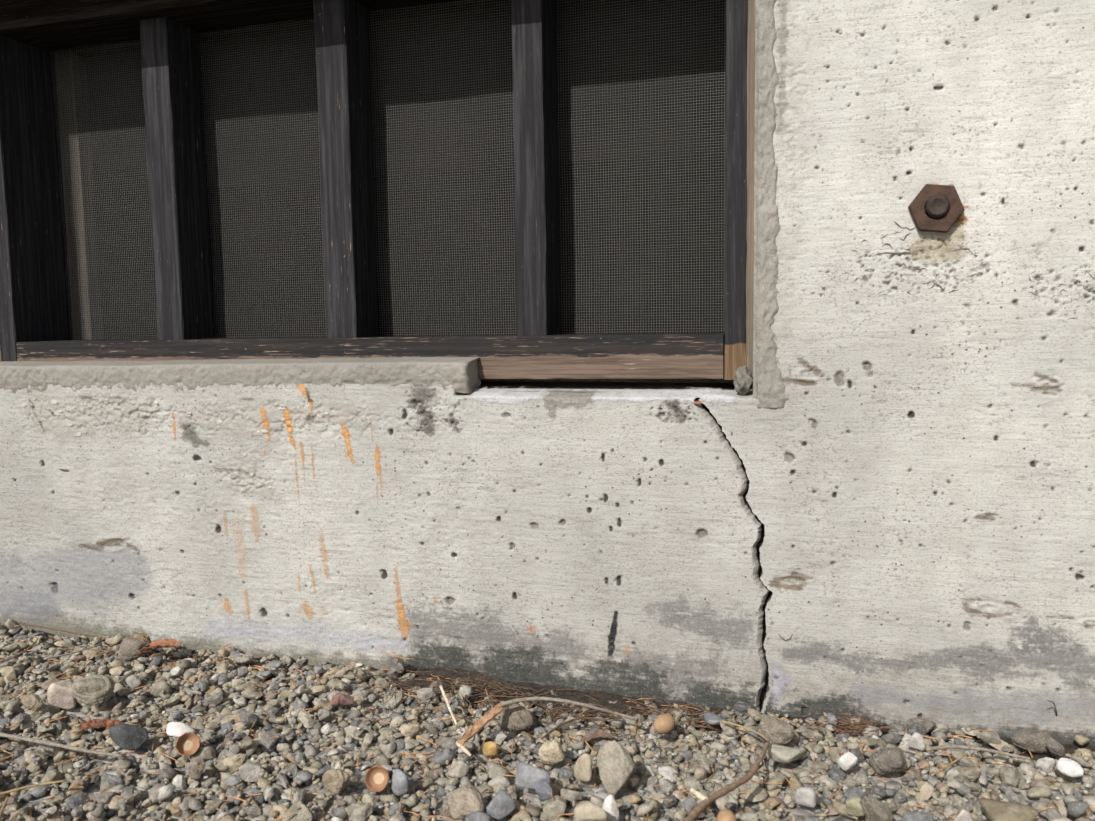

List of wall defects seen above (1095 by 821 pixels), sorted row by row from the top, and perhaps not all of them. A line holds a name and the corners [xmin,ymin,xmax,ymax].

rust [260,409,270,441]
rust [283,408,313,475]
rust [341,416,354,464]
crack [692,397,793,713]
damp [964,598,1018,617]
damp [608,611,618,656]
damp [783,616,1095,686]